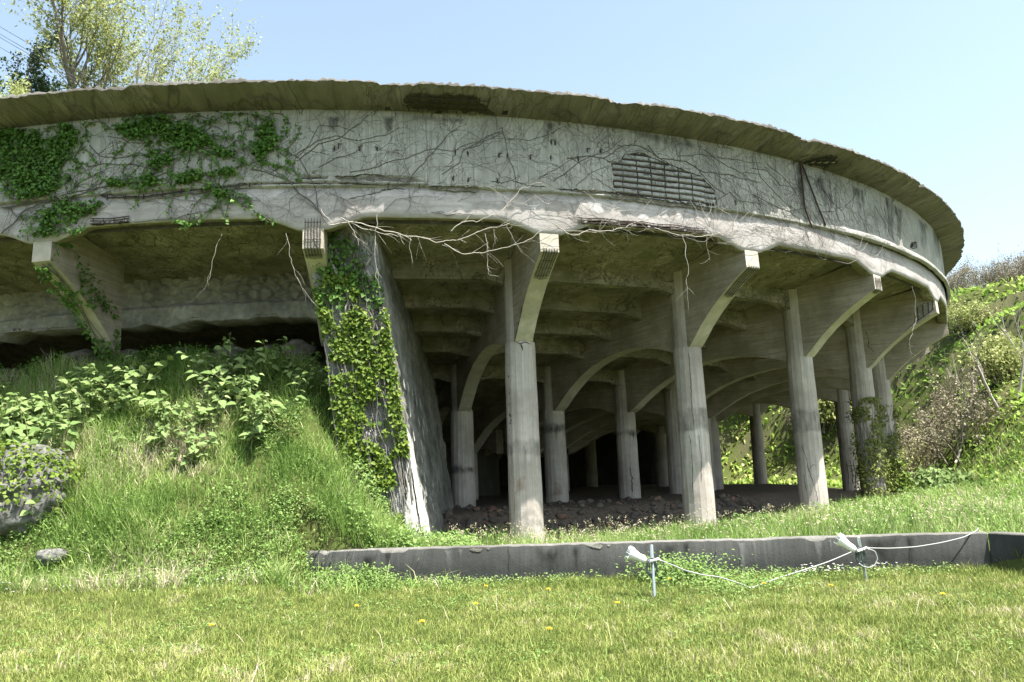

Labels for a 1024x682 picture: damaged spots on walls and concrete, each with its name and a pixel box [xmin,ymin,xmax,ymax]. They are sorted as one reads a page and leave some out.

spalling [559,152,717,211]
spalling [303,219,323,259]
spalling [534,248,558,280]